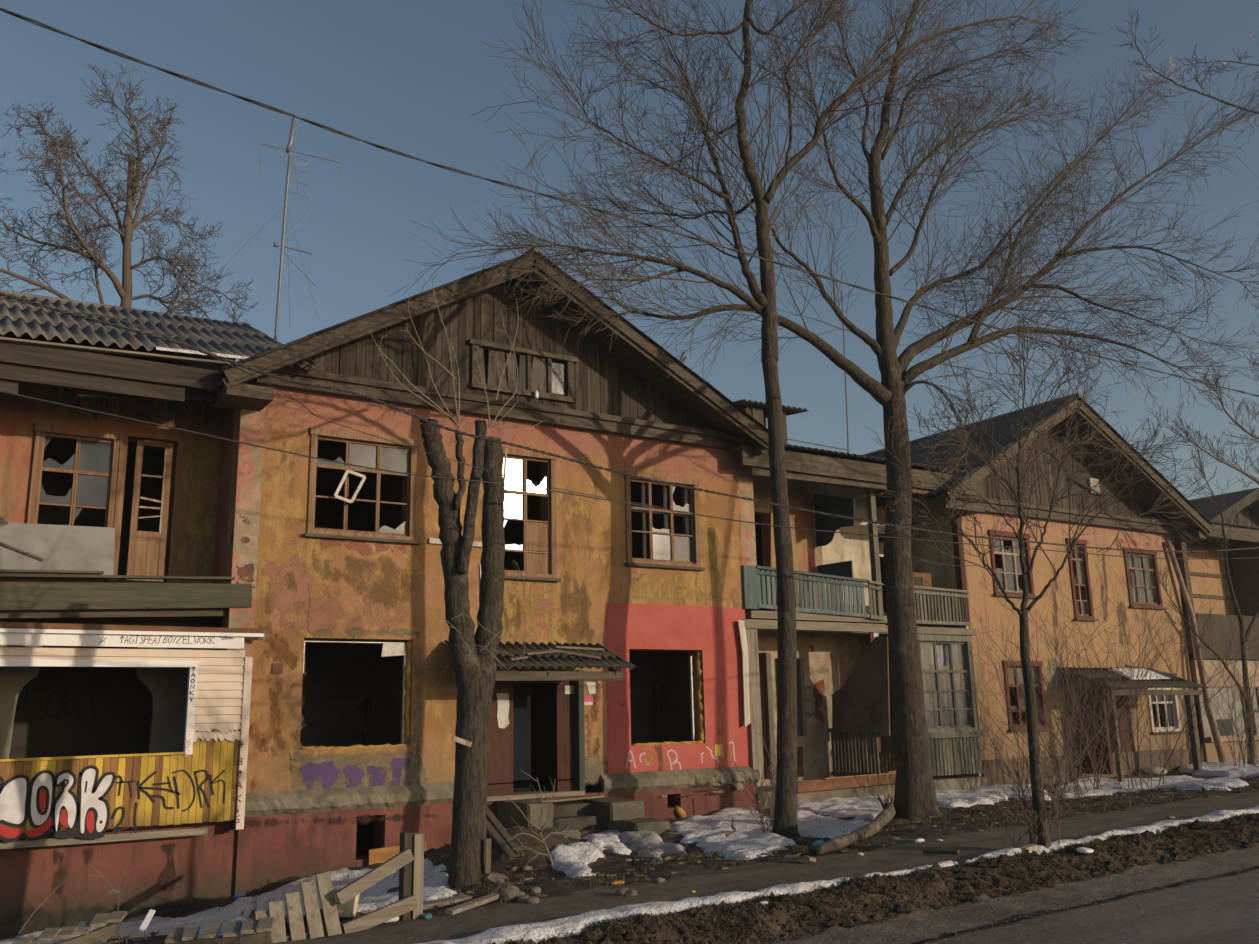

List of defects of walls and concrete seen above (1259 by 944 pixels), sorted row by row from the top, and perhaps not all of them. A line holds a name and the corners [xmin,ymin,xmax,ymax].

flaking render [237,560,255,588]